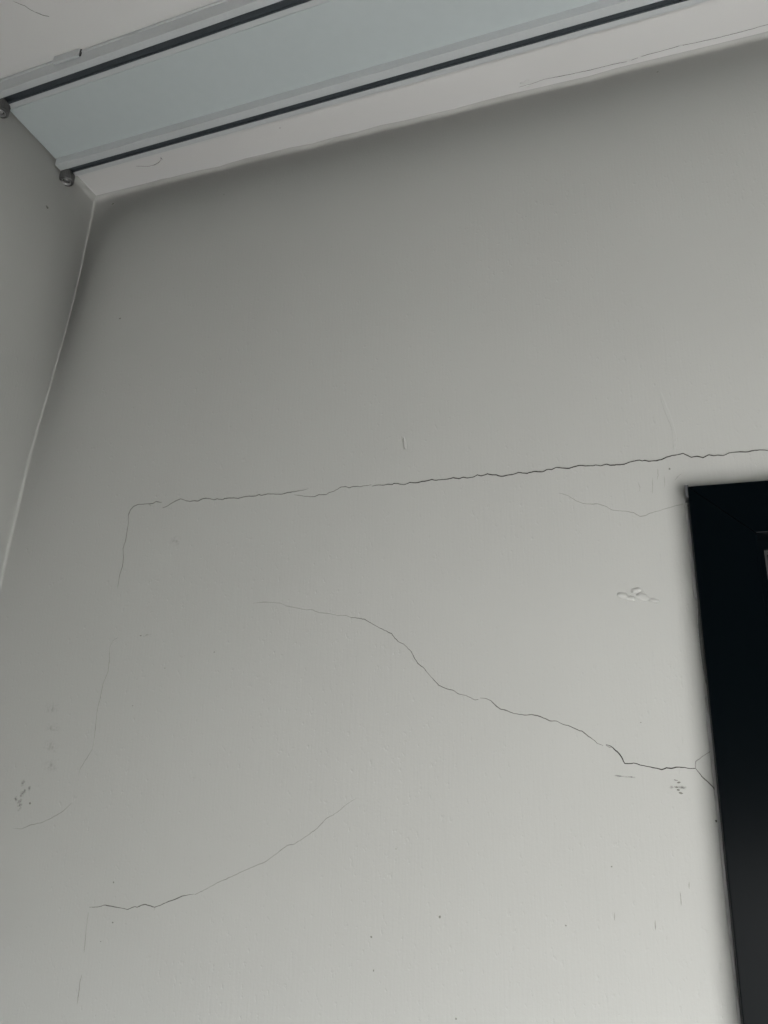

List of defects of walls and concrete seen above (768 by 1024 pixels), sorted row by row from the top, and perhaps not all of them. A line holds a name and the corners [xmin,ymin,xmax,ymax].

crack [117,449,768,588]
crack [258,602,715,790]
crack [77,799,355,1004]